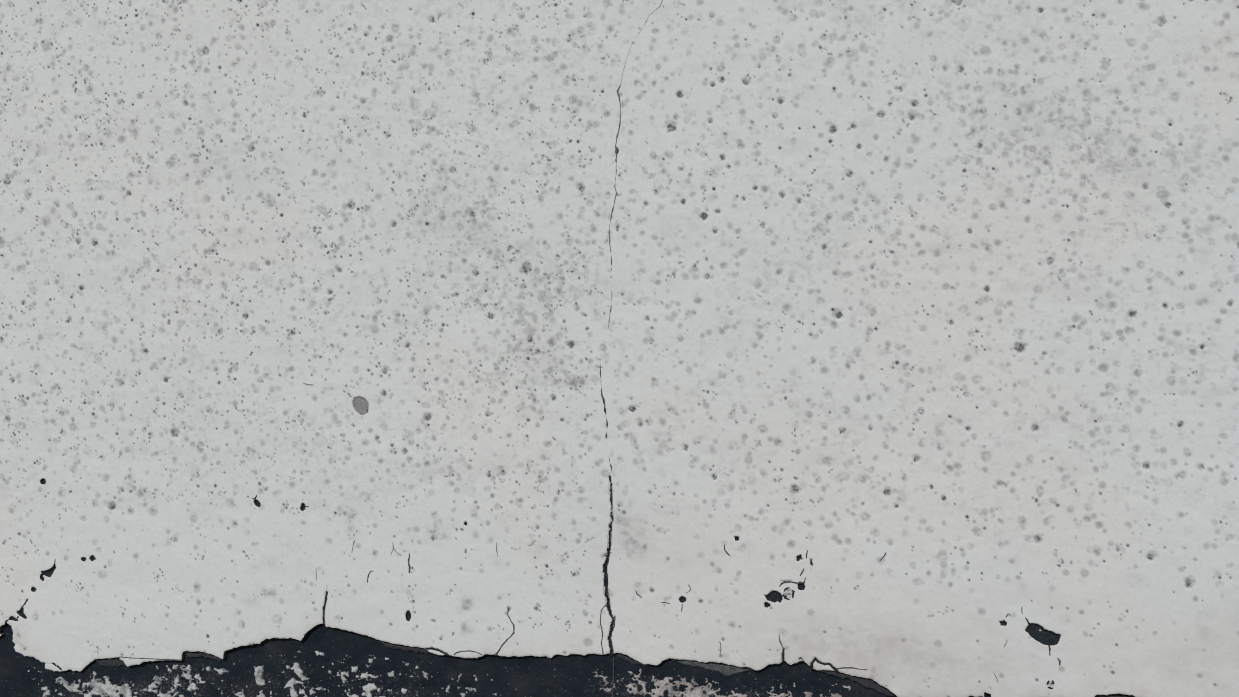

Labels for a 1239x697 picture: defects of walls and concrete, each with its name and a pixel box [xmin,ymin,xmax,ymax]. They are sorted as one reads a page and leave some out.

crack [608,0,663,328]
spalling [0,561,897,697]
crack [600,366,691,697]
spalling [1000,607,1061,656]